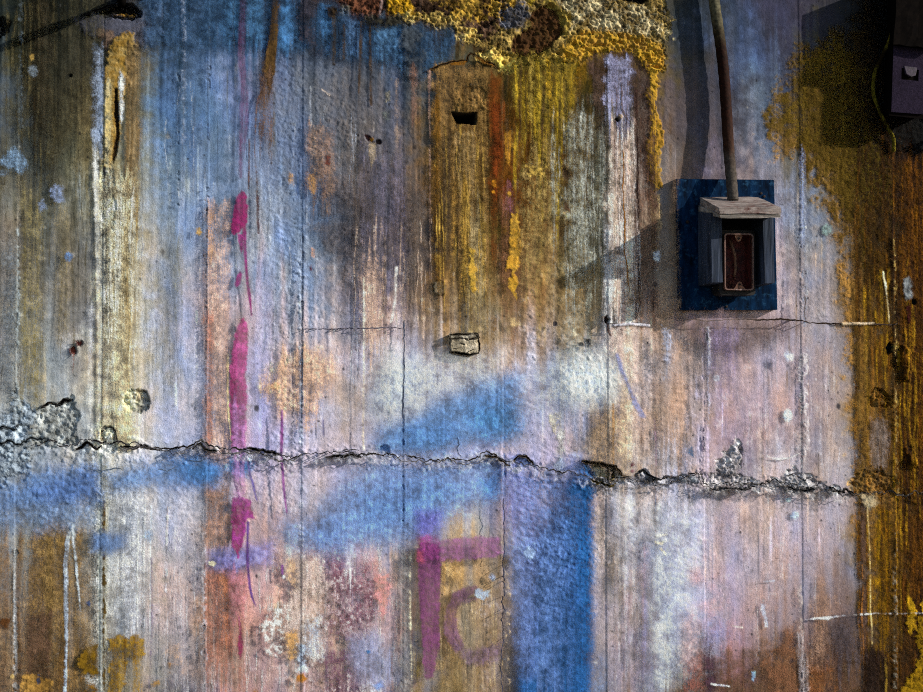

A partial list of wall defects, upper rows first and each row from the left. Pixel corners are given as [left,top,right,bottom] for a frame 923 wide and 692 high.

peeling [314,0,675,75]
rust [428,63,523,379]
crack [679,296,898,325]
rust [659,0,923,692]
spalling [0,390,81,489]
crack [41,398,72,408]
spalling [177,439,405,465]
crack [0,423,923,497]
spalling [420,453,566,479]
spalling [578,439,891,503]